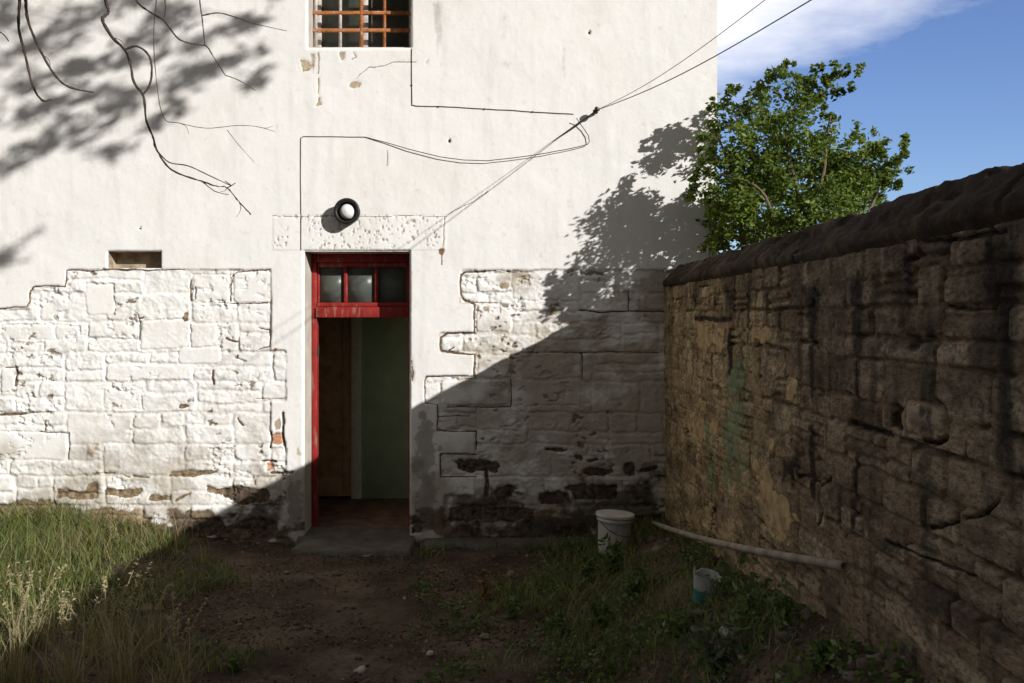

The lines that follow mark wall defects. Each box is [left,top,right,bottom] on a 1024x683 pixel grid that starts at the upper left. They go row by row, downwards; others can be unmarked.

spalling [270,412,286,447]
spalling [0,471,190,527]
spalling [169,469,270,505]
spalling [262,460,294,474]
water stain [450,471,657,537]
spalling [450,447,659,523]